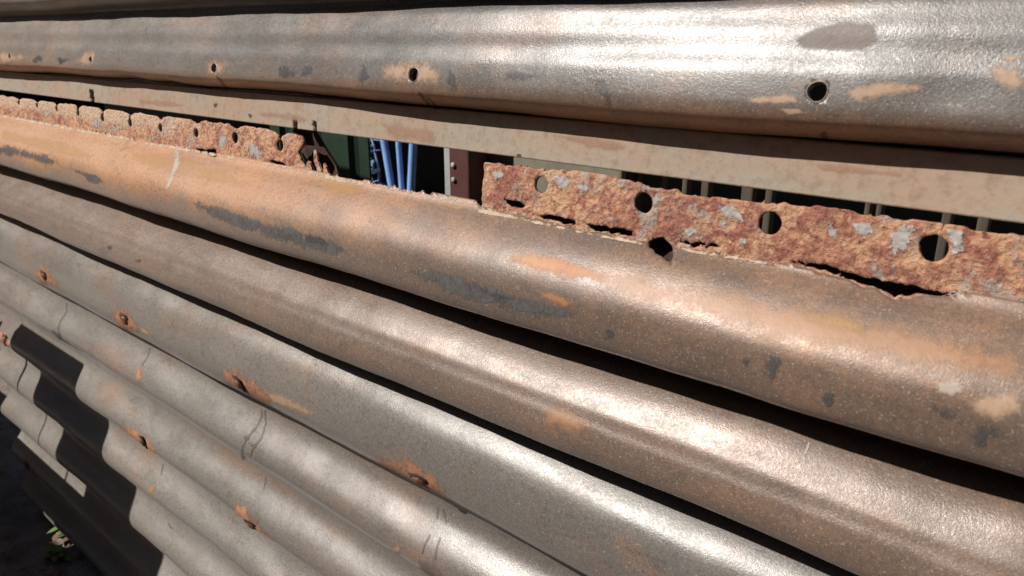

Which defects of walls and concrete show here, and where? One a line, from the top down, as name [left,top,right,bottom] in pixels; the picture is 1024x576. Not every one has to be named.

corrosion [385,61,438,82]
corrosion [0,115,129,140]
corrosion [682,248,781,266]
crack [793,261,949,297]
corrosion [110,308,151,336]
corrosion [511,254,1010,371]
corrosion [223,369,309,414]
corrosion [379,458,444,496]